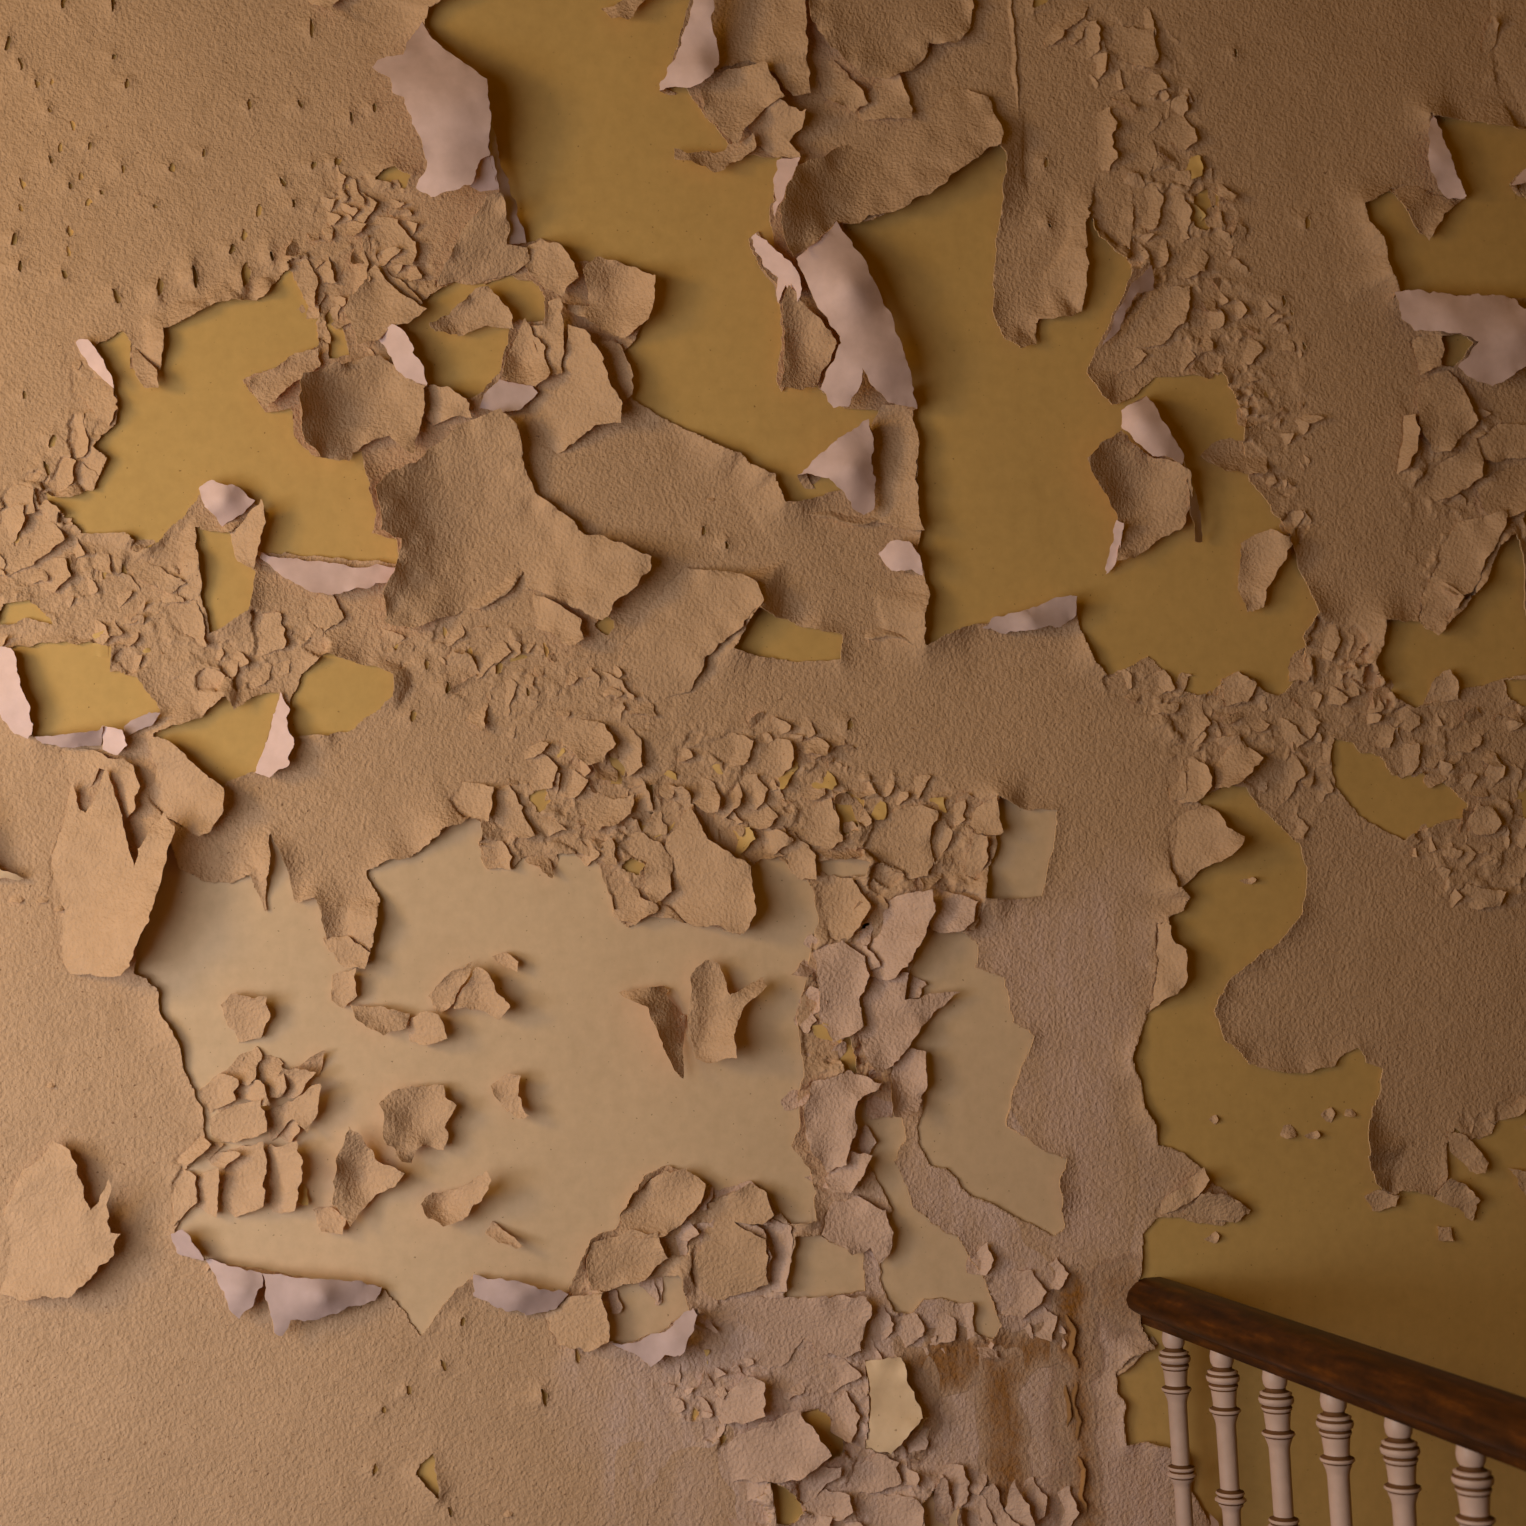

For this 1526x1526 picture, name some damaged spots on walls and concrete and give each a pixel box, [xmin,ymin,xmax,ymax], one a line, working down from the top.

peeling [1043,0,1136,171]
peeling [1111,6,1197,174]
peeling [320,175,426,281]
peeling [1115,245,1228,375]
peeling [1278,0,1526,881]
peeling [493,778,535,838]
peeling [521,741,560,813]
peeling [555,717,642,799]
peeling [0,1141,120,1301]
peeling [698,1364,860,1526]
peeling [855,1336,1047,1526]
peeling [1057,1486,1079,1526]